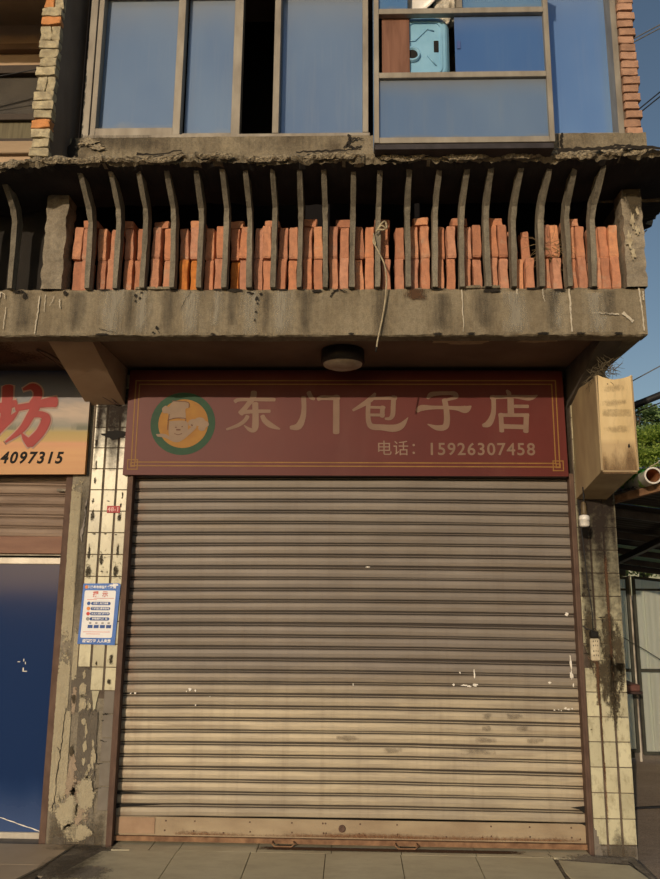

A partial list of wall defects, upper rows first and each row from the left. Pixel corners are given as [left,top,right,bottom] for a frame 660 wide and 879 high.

spalling [0,0,182,169]
spalling [195,151,364,162]
crack [296,134,363,153]
spalling [377,154,429,162]
peeling [625,208,647,260]
water stain [542,288,573,332]
water stain [622,287,645,331]
peeling [48,480,119,842]
water stain [583,557,625,727]